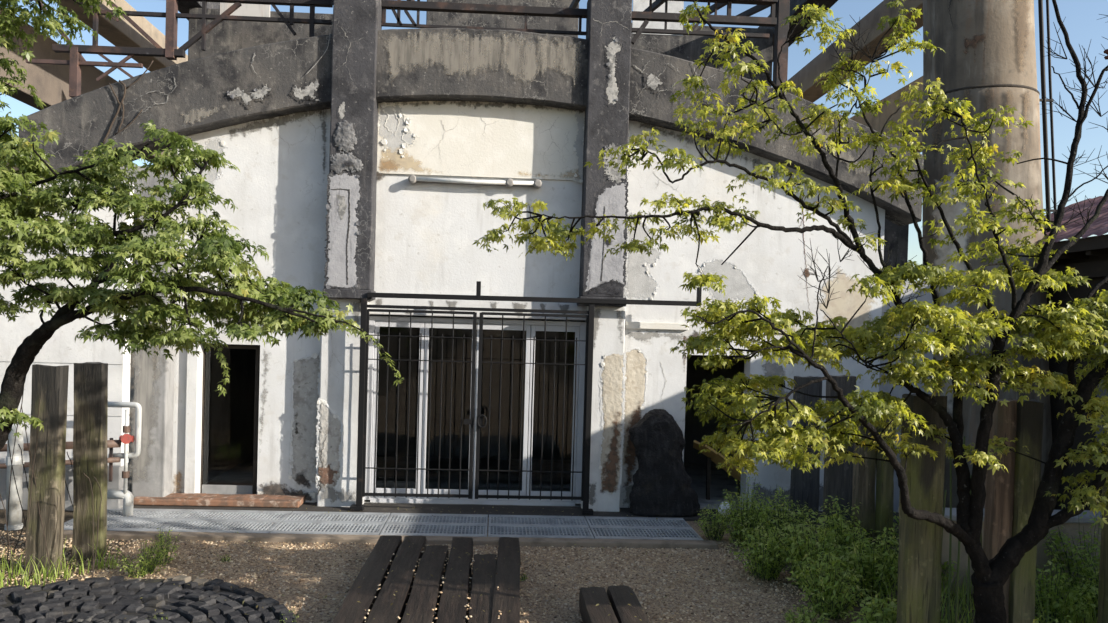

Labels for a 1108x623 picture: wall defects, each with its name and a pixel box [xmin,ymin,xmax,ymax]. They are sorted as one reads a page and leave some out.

peeling [225,82,273,109]
peeling [289,76,322,103]
leakage [387,31,581,85]
peeling [603,34,627,107]
leakage [377,150,423,180]
peeling [582,142,662,300]
flaking render [287,351,345,494]
flaking render [598,346,649,496]